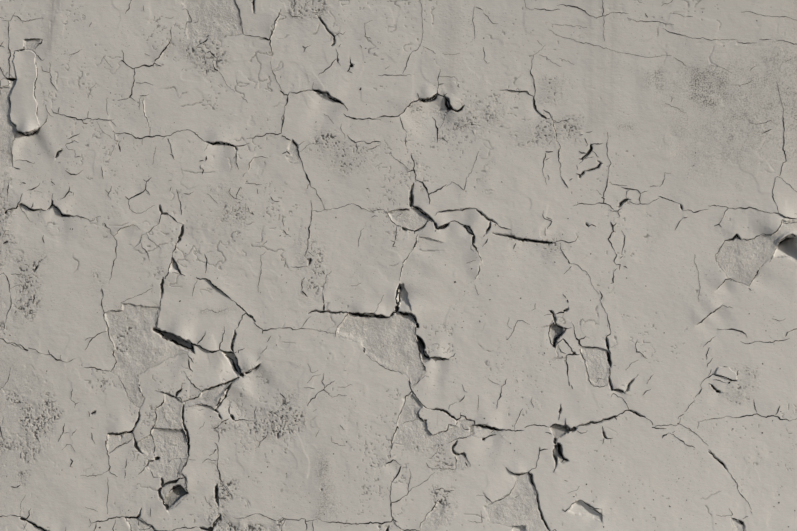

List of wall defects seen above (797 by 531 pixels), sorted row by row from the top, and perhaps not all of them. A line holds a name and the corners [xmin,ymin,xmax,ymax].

crack [525,0,793,66]
peeling [0,38,57,167]
crack [505,40,797,284]
crack [0,0,677,471]
peeling [715,220,797,290]
crack [0,485,46,531]
flaking render [80,303,260,511]
crack [205,434,232,507]
flaking render [276,304,475,470]
crack [386,379,457,531]
flaking render [471,449,556,531]
peeling [563,500,603,523]